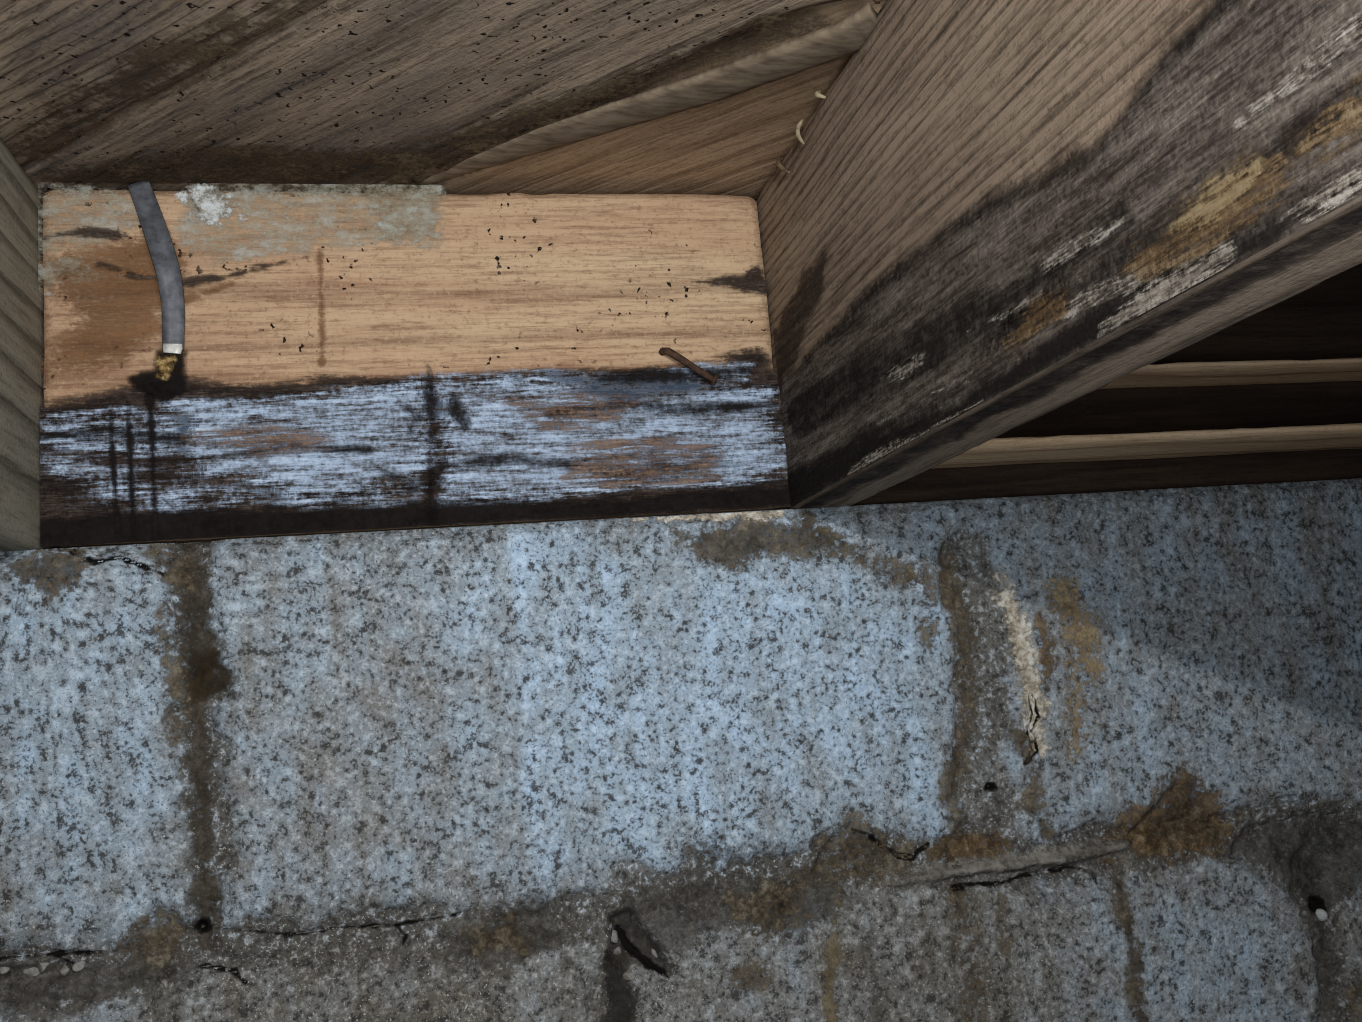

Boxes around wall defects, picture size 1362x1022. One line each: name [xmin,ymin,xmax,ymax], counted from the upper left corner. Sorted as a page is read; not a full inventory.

water stain [6,0,1362,601]
water stain [143,543,234,861]
water stain [992,571,1060,759]
water stain [441,896,576,974]
water stain [622,872,867,1022]
crack [852,829,930,861]
water stain [947,884,988,1022]
crack [950,865,1097,891]
water stain [1087,861,1147,1022]
water stain [1227,812,1362,1022]